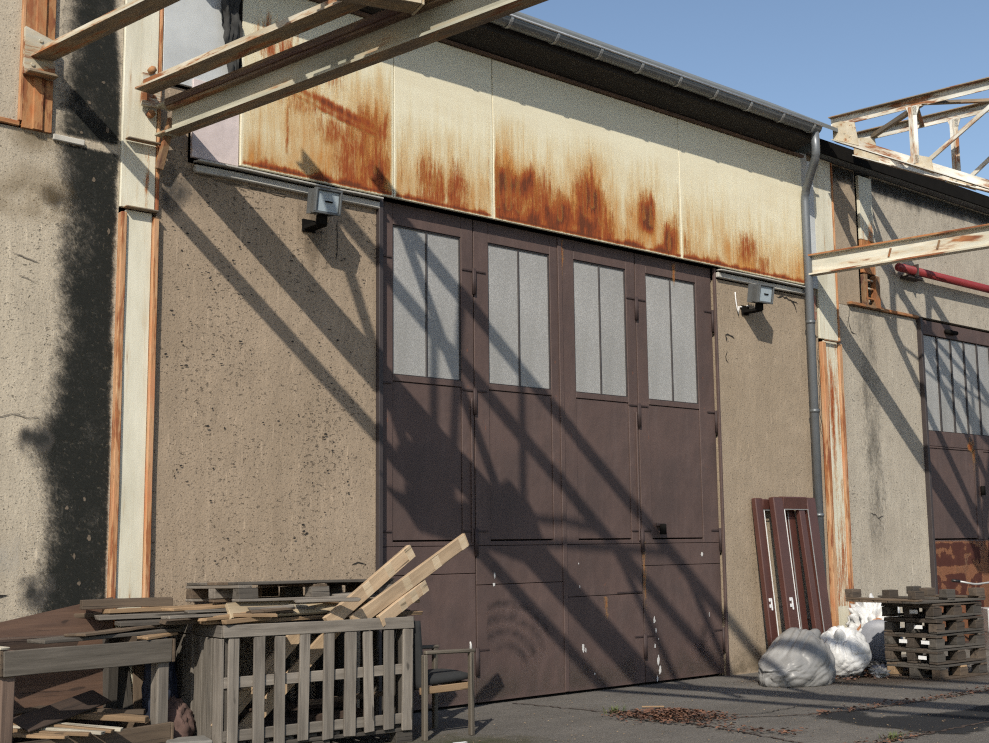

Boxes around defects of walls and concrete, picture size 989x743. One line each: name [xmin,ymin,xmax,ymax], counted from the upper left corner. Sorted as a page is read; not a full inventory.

rust [243,80,804,283]
rust [828,365,841,465]
rust [836,513,848,606]